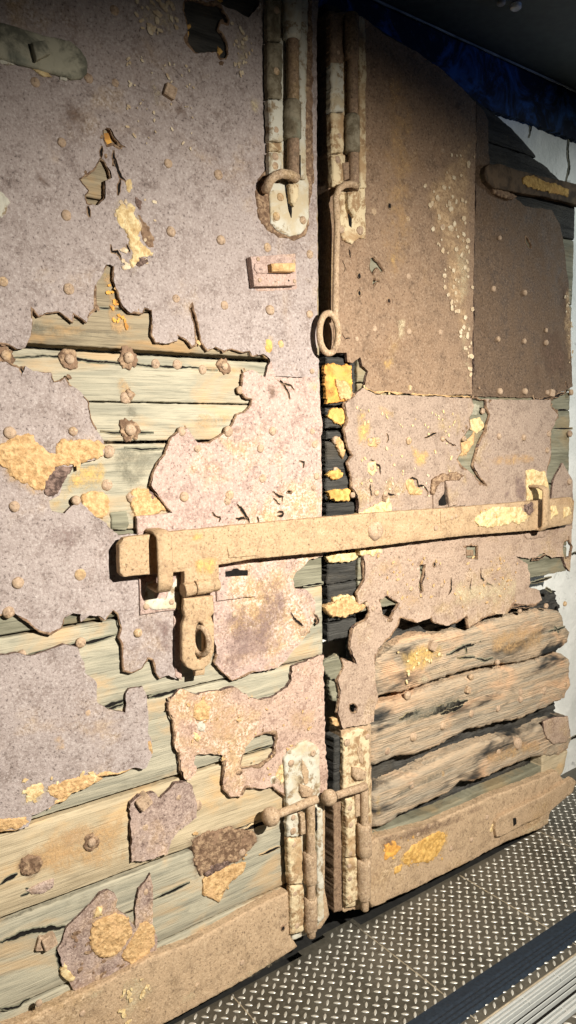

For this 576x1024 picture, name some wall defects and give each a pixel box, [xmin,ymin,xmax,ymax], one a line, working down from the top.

peeling [265,339,284,353]
rust [130,488,167,517]
rust [517,480,534,515]
peeling [193,699,211,742]
peeling [118,978,150,1024]